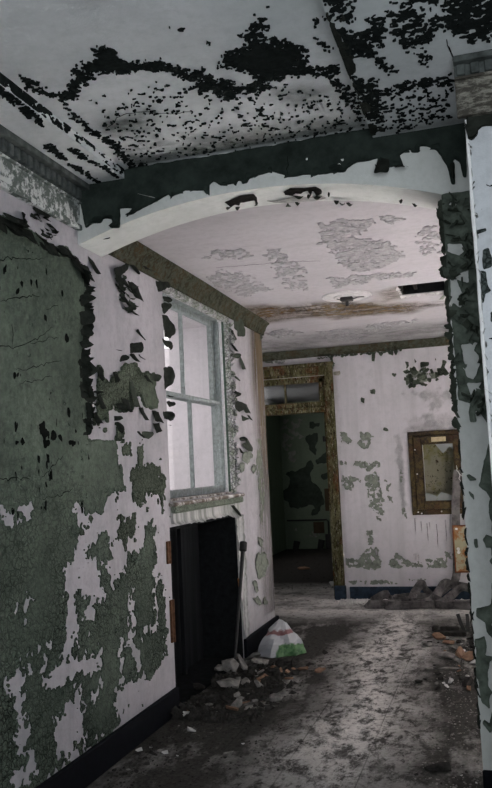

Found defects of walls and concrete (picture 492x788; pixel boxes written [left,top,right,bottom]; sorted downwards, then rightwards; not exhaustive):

peeling [0,195,269,788]
peeling [0,0,492,523]
peeling [346,530,453,570]
peeling [455,528,492,733]